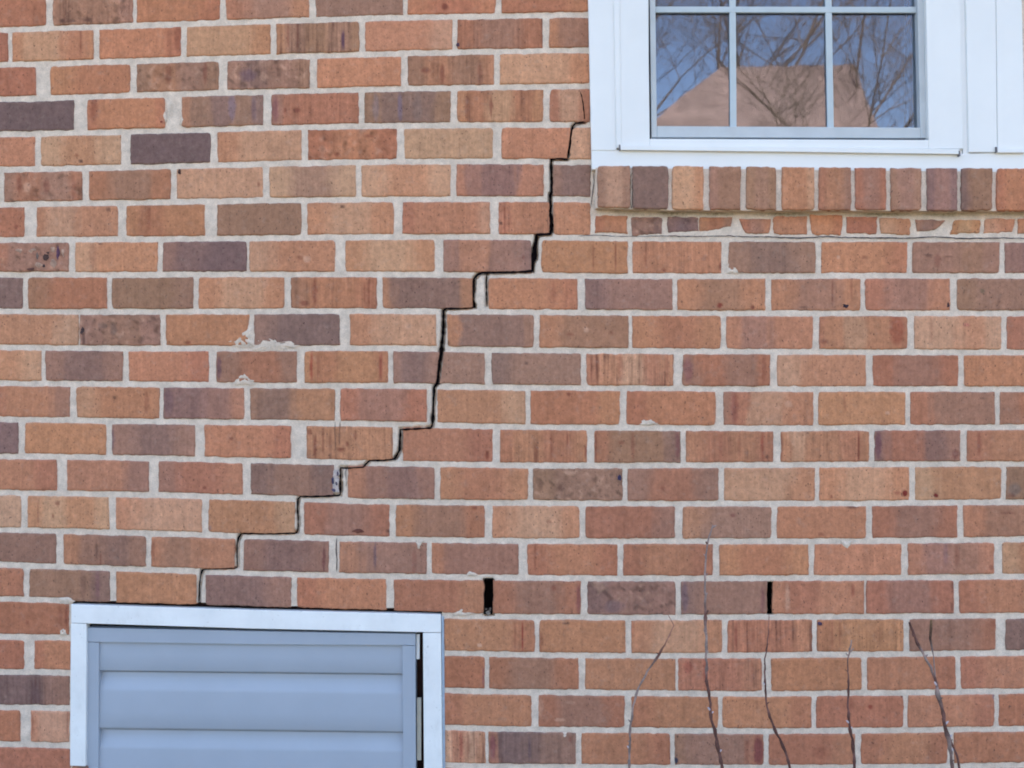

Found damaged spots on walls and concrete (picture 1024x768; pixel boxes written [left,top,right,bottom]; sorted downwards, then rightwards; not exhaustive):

crack [198,92,585,601]